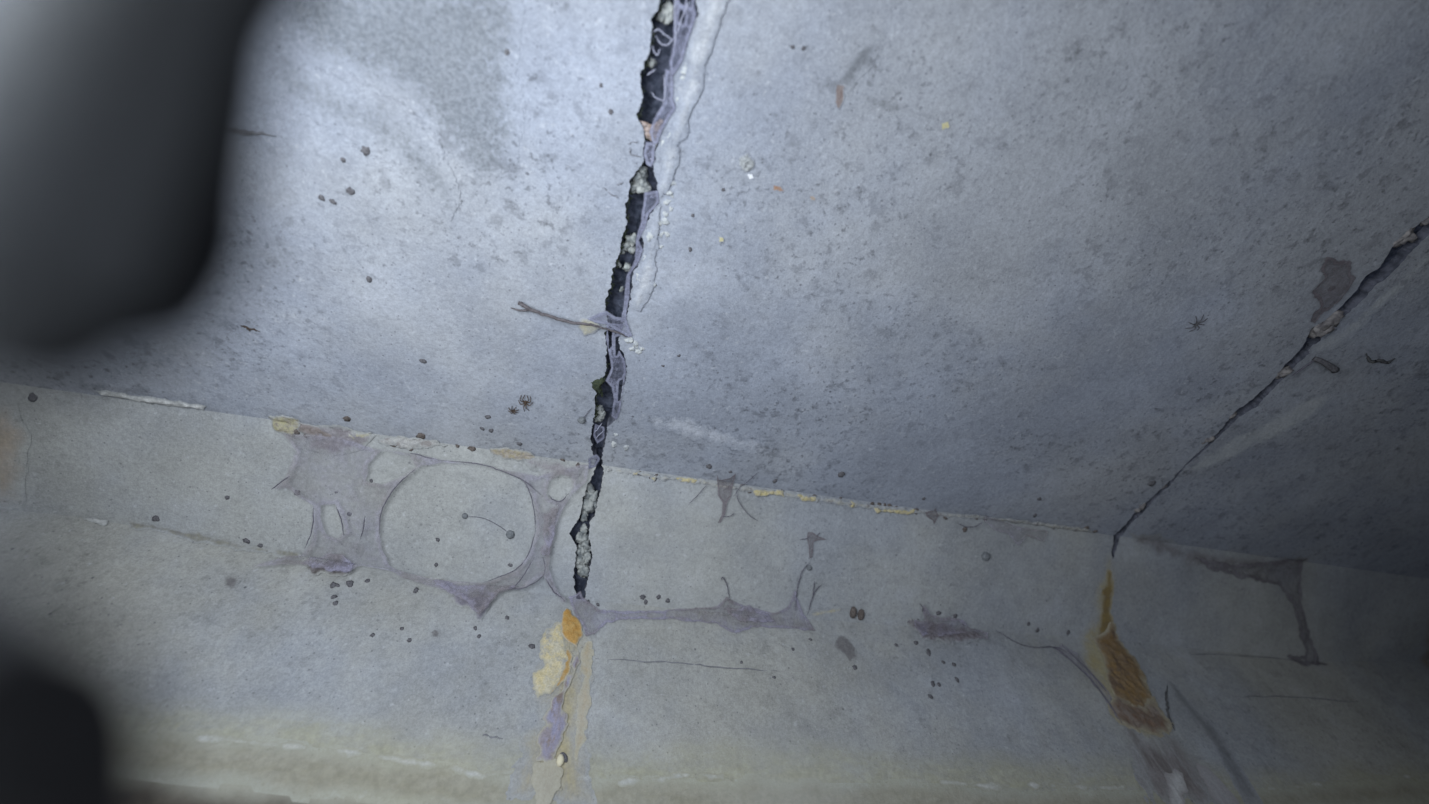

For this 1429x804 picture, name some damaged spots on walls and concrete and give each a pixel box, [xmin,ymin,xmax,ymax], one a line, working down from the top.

damp [268,415,447,457]
crack [571,0,697,600]
efflorescence [648,414,781,455]
crack [1201,217,1429,444]
rust [506,608,597,804]
rust [1078,552,1240,804]